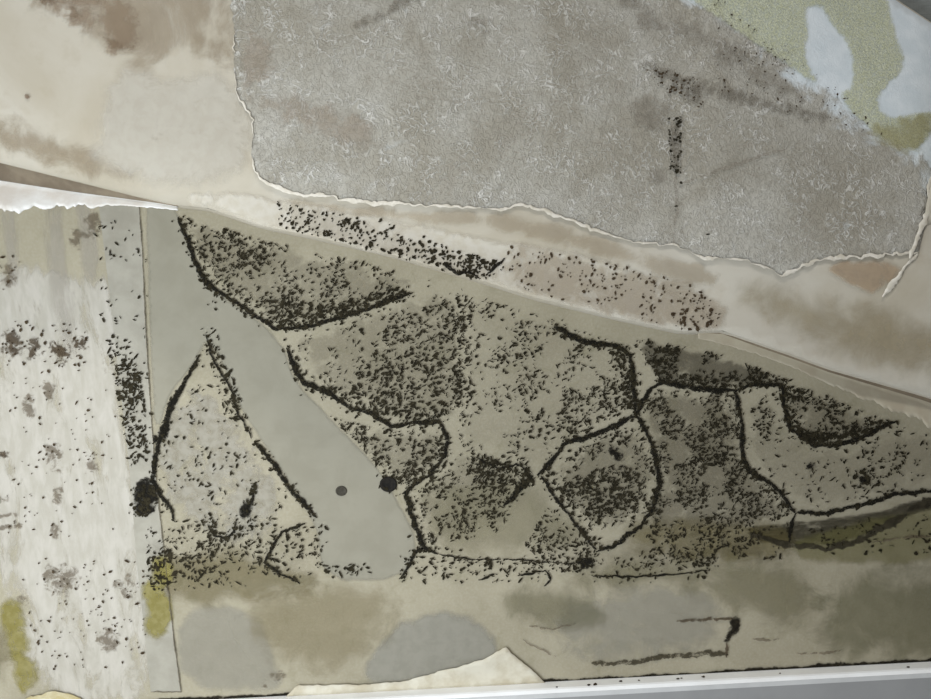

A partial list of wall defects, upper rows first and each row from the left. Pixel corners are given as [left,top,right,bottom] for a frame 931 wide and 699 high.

damp [0,255,16,290]
damp [70,214,116,245]
damp [1,299,312,692]
crack [128,334,329,584]
crack [171,215,931,586]
damp [178,201,931,585]